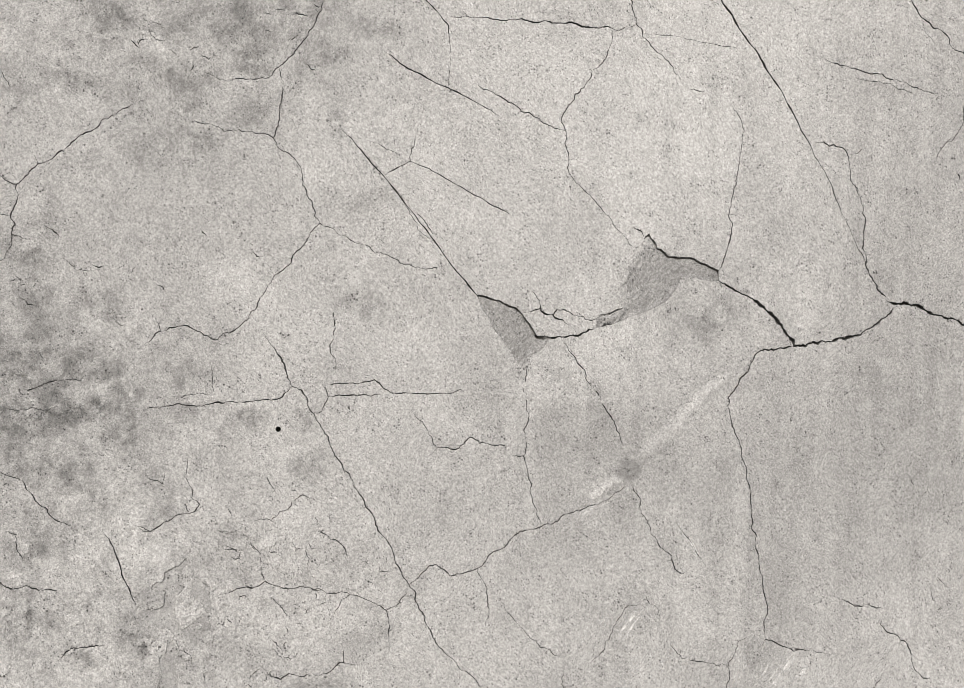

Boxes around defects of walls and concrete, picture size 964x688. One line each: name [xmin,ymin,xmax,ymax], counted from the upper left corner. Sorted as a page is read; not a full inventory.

crack [0,83,152,306]
crack [131,3,511,345]
flaking render [596,233,719,328]
crack [1,352,82,411]
flaking render [477,295,551,366]
crack [384,0,964,688]
crack [1,472,74,528]
crack [128,308,705,688]
crack [0,582,57,591]
crack [105,535,136,605]